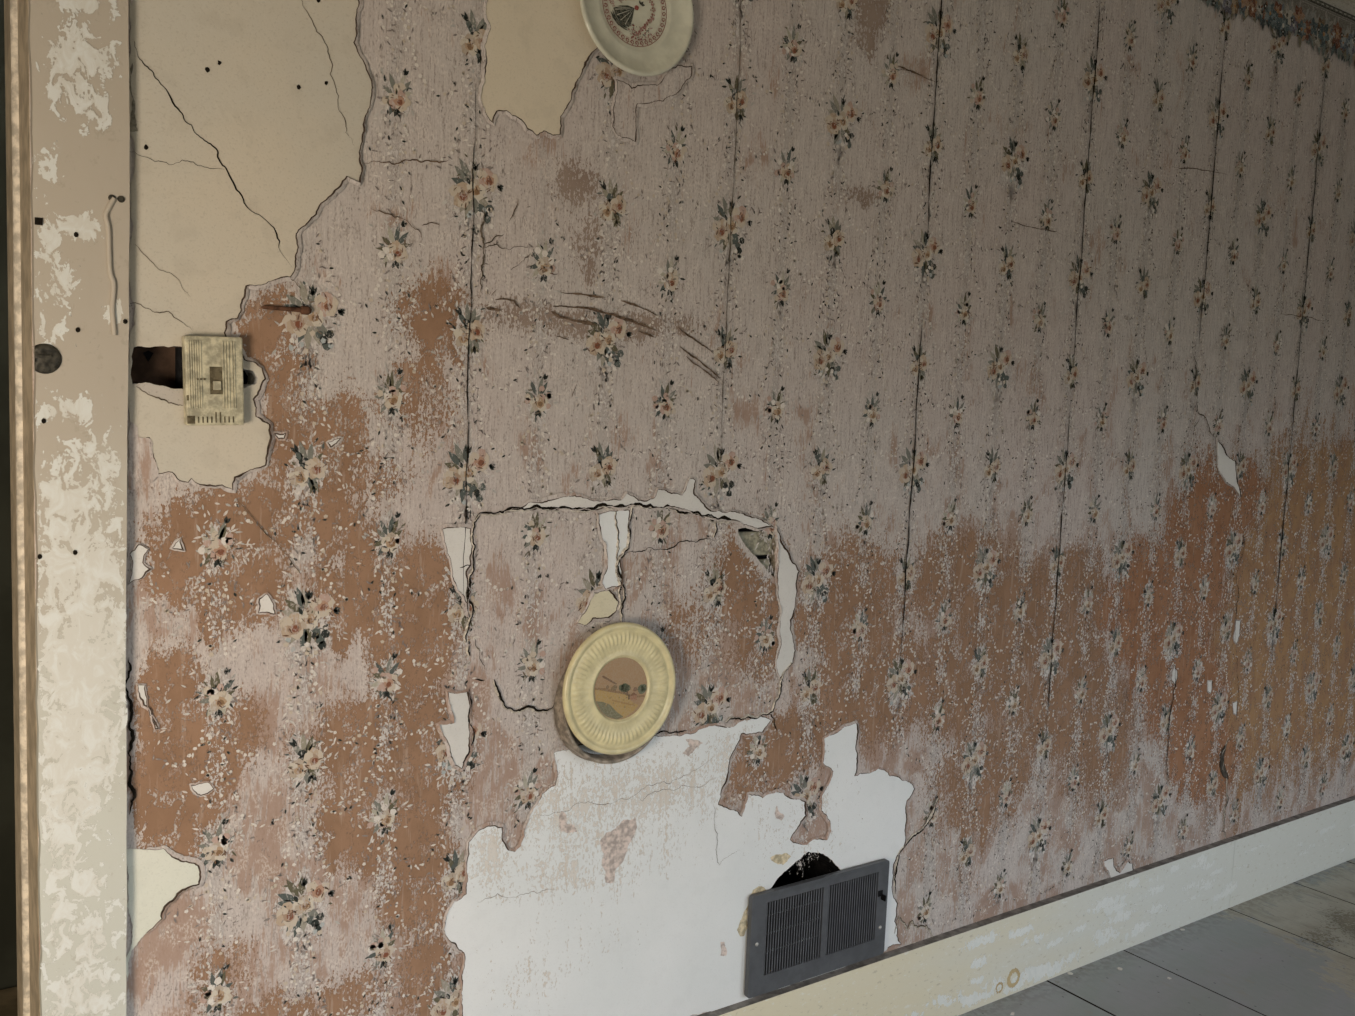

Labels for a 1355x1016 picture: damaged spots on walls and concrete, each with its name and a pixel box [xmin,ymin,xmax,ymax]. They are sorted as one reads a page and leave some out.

peeling [32,140,104,346]
peeling [36,0,122,138]
peeling [103,298,123,328]
spalling [131,346,184,406]
crack [134,41,301,290]
spalling [243,369,257,388]
crack [302,1,448,165]
peeling [34,378,128,1016]
leakage [130,150,714,1016]
leakage [643,506,1145,886]
leakage [1160,394,1355,836]